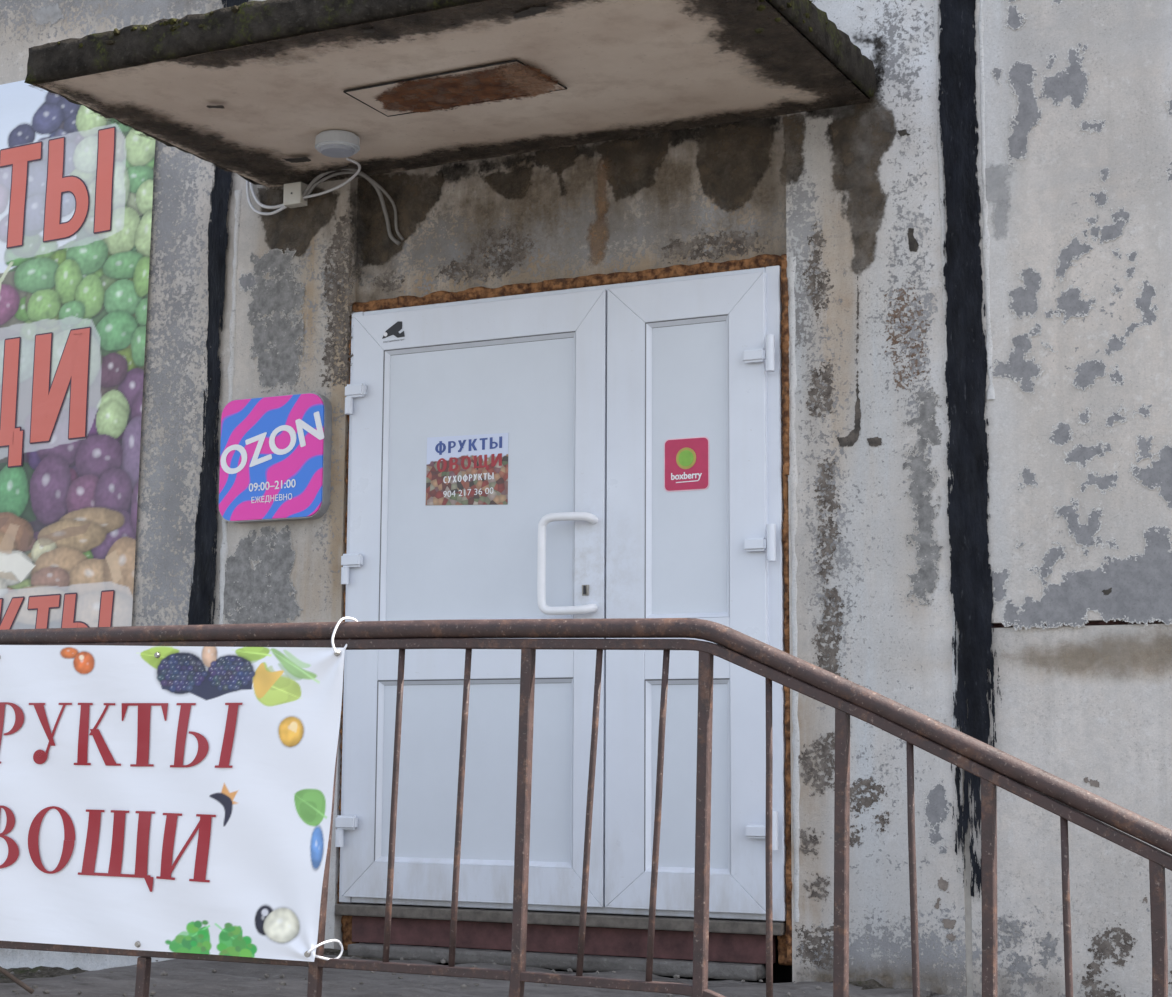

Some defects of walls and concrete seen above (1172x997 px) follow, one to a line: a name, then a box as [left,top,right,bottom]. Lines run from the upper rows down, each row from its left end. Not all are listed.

peeling [1003,0,1028,33]
leakage [33,0,897,296]
rust [375,62,563,113]
peeling [991,42,1108,168]
peeling [991,167,1172,631]